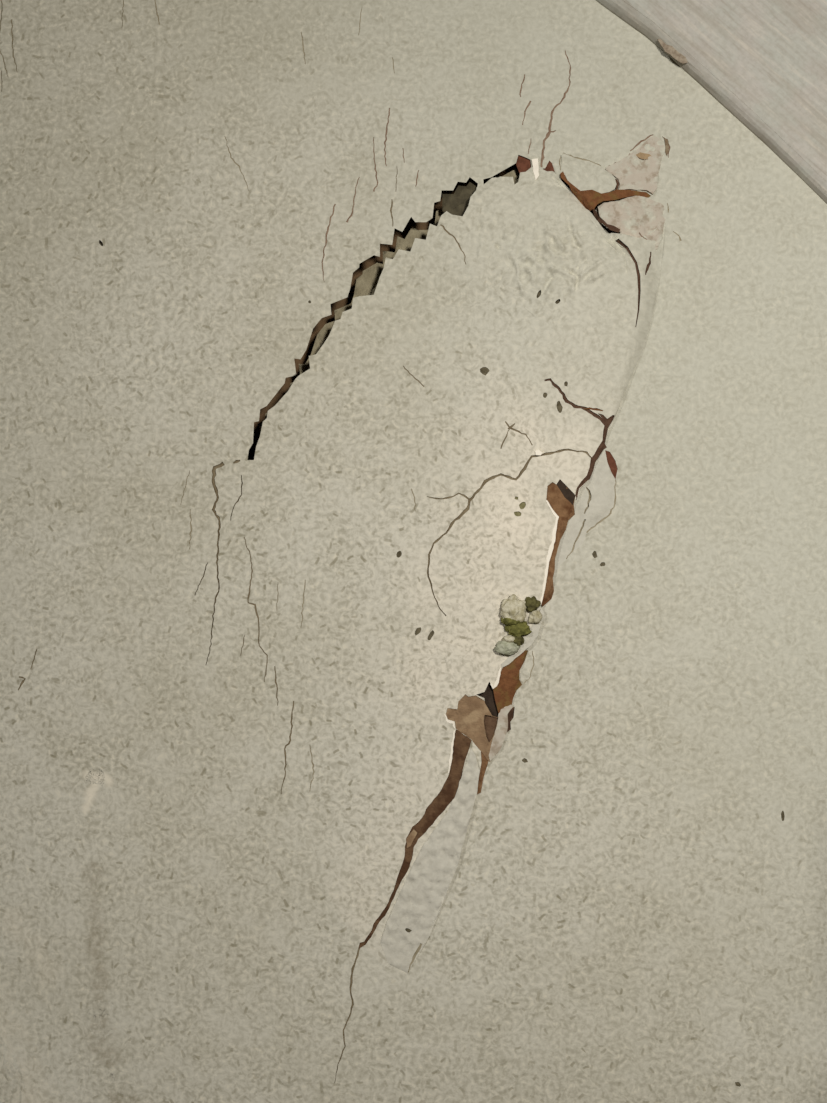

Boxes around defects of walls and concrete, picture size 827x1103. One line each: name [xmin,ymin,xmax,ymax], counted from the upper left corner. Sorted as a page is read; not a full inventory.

crack [502,51,670,185]
peeling [532,136,669,250]
crack [592,209,651,327]
crack [180,108,477,794]
crack [411,379,616,616]
peeling [380,450,618,973]
crack [334,730,488,1083]